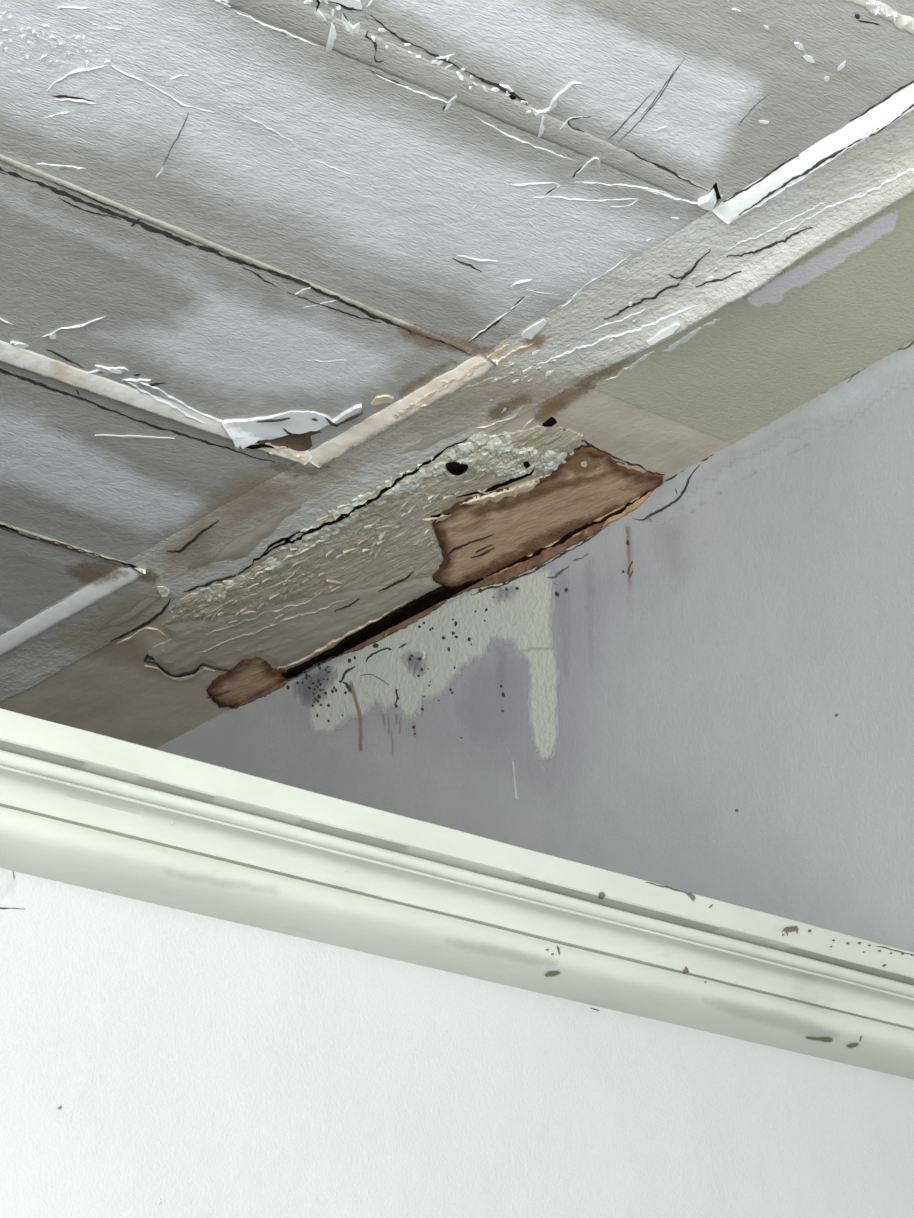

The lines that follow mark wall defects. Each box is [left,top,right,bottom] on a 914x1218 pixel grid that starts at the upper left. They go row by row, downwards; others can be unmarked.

peeling [0,12,214,177]
peeling [210,0,389,53]
peeling [369,43,717,211]
peeling [794,42,815,63]
peeling [734,106,914,217]
peeling [855,0,914,30]
peeling [727,169,914,251]
peeling [295,285,337,308]
peeling [453,255,499,272]
peeling [469,256,629,342]
peeling [42,301,720,761]
damp [247,526,664,833]